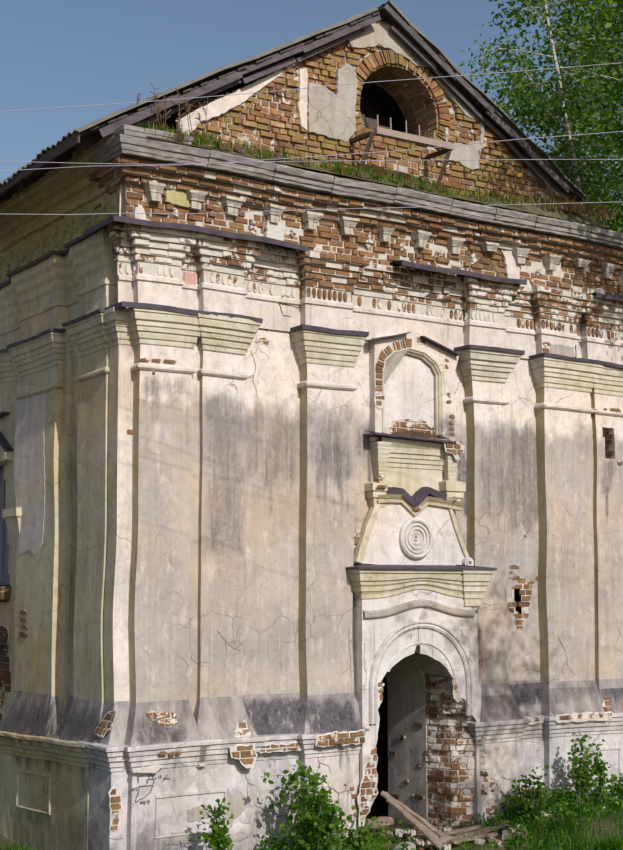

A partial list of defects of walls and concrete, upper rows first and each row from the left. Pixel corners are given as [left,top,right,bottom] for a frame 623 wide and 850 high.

flaking render [347,22,431,69]
flaking render [175,61,358,142]
flaking render [436,76,484,171]
flaking render [264,220,285,249]
flaking render [374,335,427,409]
spalling [506,564,538,630]
flaking render [0,624,12,725]
flaking render [144,708,178,729]
flaking render [229,719,302,768]
damp [244,700,366,735]
flaking render [109,785,123,832]
flaking render [316,729,378,827]